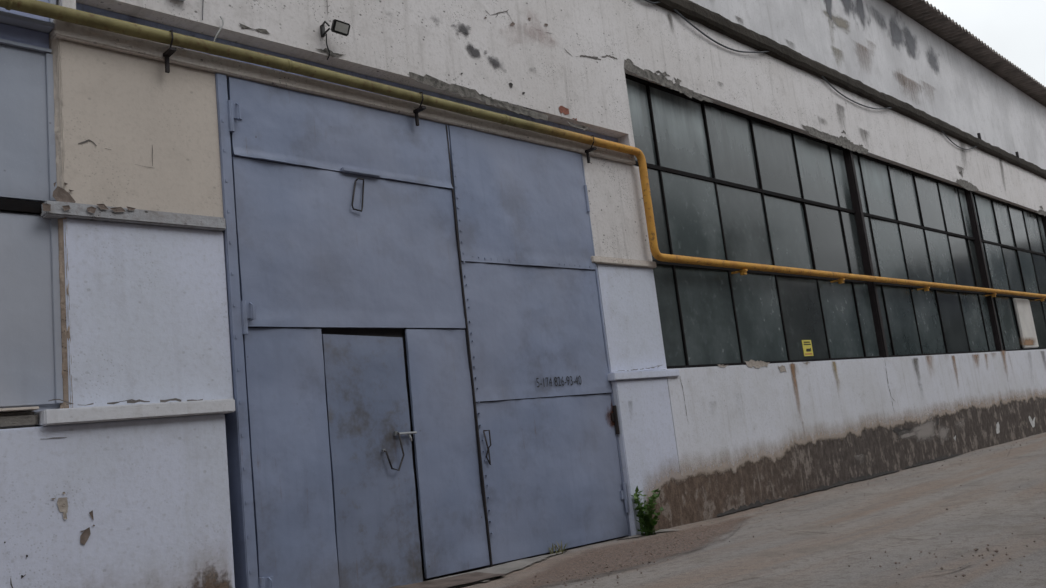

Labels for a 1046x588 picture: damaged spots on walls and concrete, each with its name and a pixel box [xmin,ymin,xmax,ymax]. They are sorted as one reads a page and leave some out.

leakage [824,0,916,57]
leakage [928,51,939,71]
spalling [42,182,76,211]
peeling [87,204,136,213]
leakage [646,393,1046,531]
peeling [52,492,68,519]
spalling [80,510,95,545]
leakage [193,568,230,588]